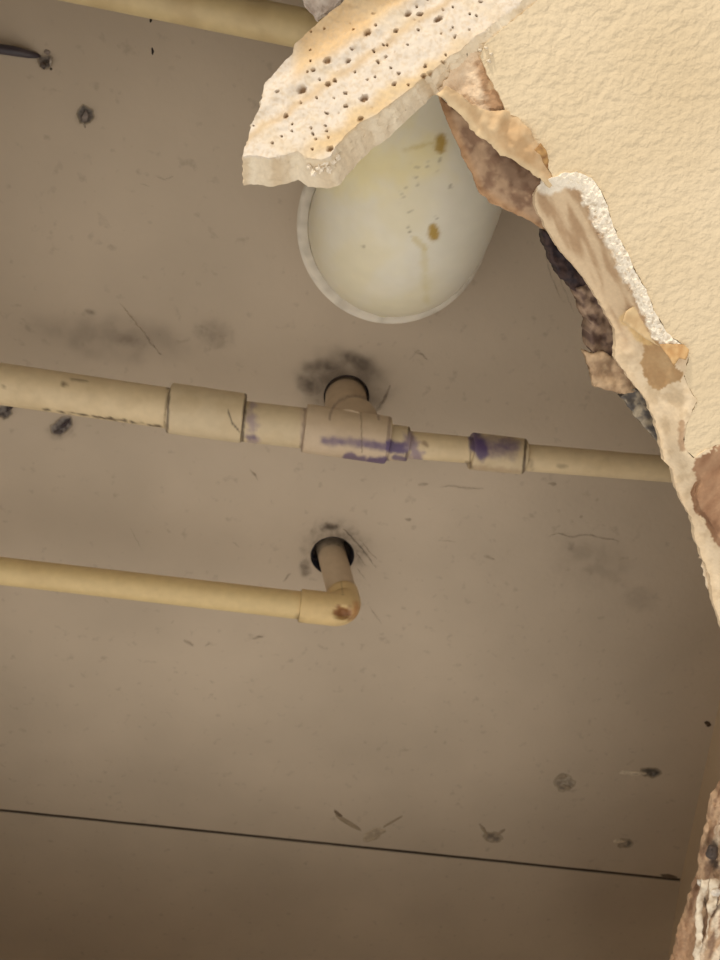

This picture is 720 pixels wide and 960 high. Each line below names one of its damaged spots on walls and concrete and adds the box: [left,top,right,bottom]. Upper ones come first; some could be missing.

spalling [532,172,720,627]
spalling [670,781,720,960]